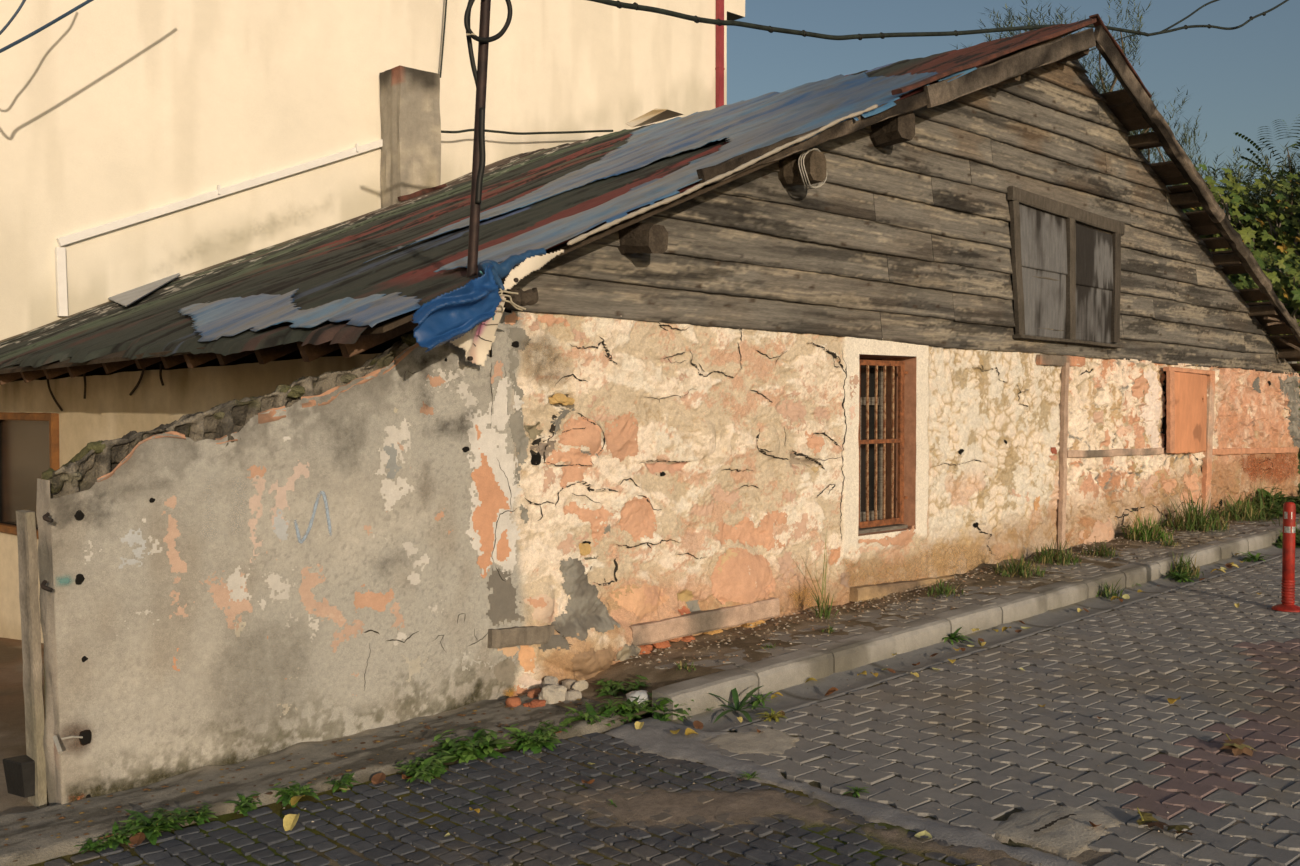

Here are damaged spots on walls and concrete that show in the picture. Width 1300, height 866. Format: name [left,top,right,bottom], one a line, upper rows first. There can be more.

spalling [60,431,186,482]
spalling [258,333,419,424]
crack [492,336,705,586]
crack [648,322,847,539]
crack [972,364,1029,407]
peeling [116,460,428,682]